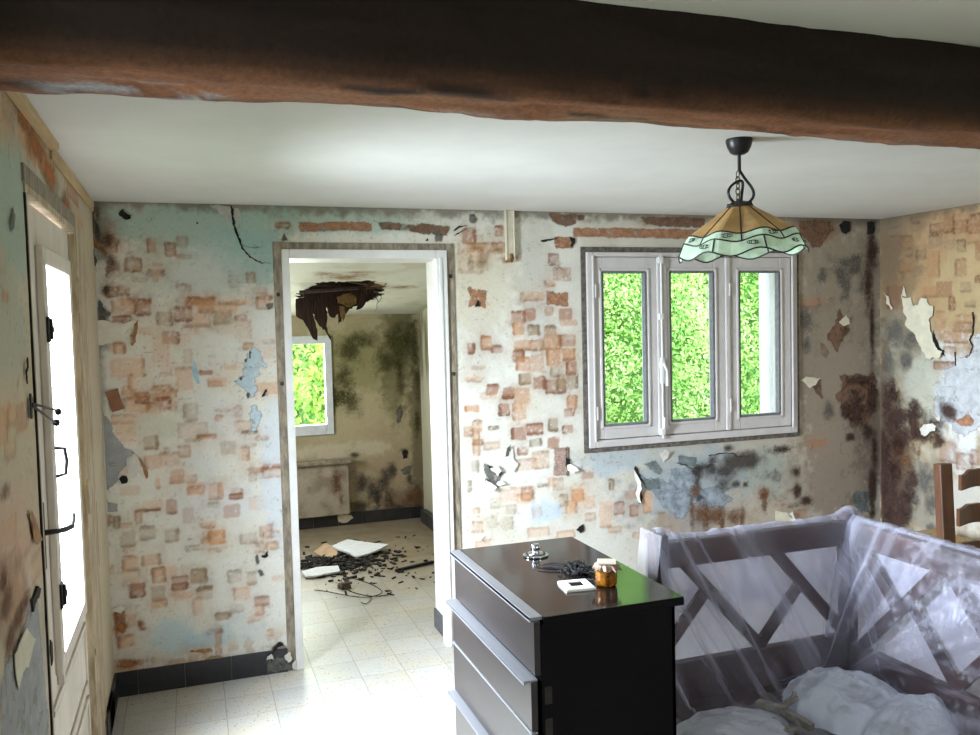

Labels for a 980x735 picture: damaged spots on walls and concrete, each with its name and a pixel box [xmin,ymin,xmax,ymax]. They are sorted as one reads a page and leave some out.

crack [211,204,266,264]
spalling [295,280,387,341]
flaking render [468,287,487,308]
damp [818,234,878,354]
flaking render [884,286,945,360]
damp [333,324,420,410]
flaking render [920,333,980,436]
flaking render [103,388,148,490]
damp [333,465,421,511]
flaking render [483,445,518,491]
peeling [634,450,733,518]
damp [824,322,957,530]